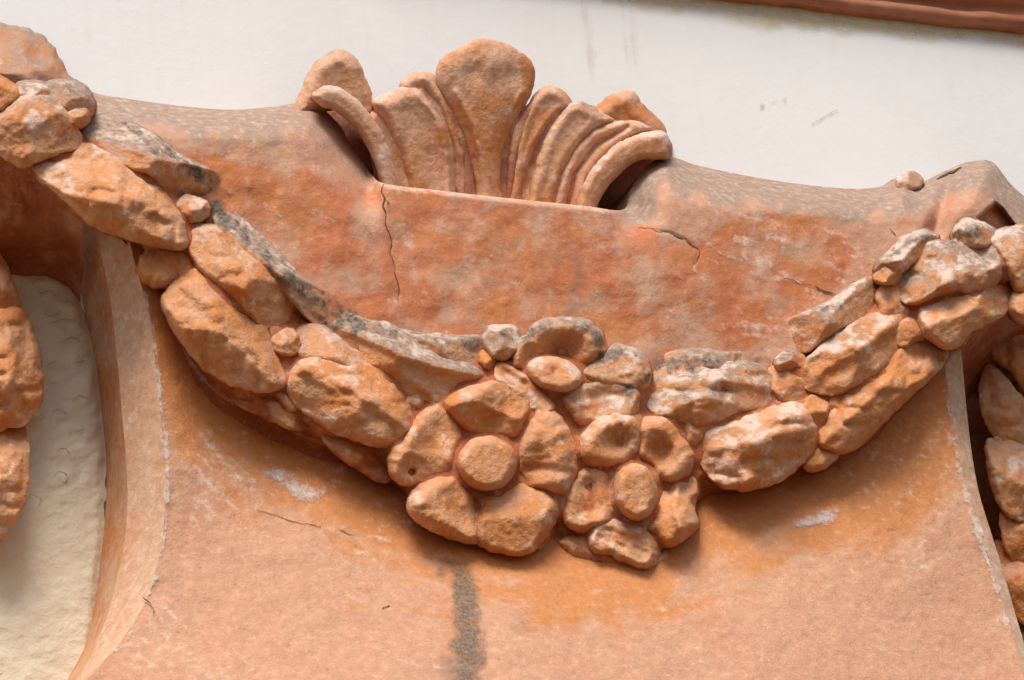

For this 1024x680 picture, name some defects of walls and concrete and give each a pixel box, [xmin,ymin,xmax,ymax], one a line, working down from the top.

crack [381,184,400,301]
crack [639,227,700,266]
water stain [452,567,485,680]